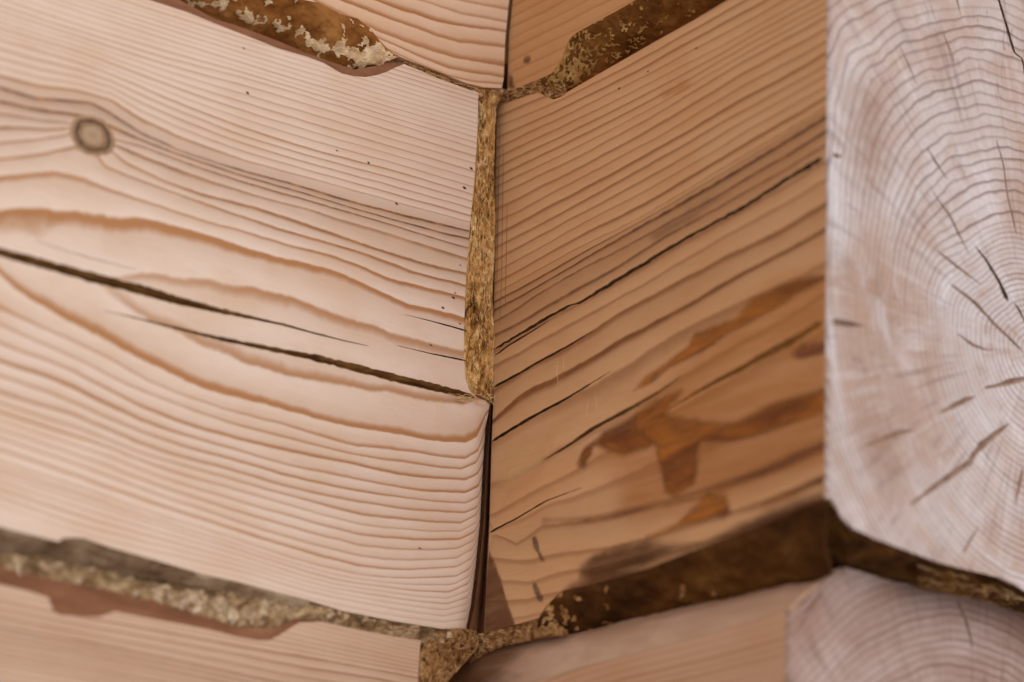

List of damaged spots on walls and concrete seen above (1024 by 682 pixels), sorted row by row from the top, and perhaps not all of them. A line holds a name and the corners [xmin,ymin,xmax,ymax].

crack [998,0,1024,71]
crack [495,153,842,355]
crack [926,141,1024,351]
crack [0,241,596,398]
crack [492,371,611,442]
crack [544,318,866,460]
crack [864,430,913,447]
crack [910,424,1009,505]
crack [940,377,1024,413]
crack [1015,469,1023,501]
crack [962,528,978,555]